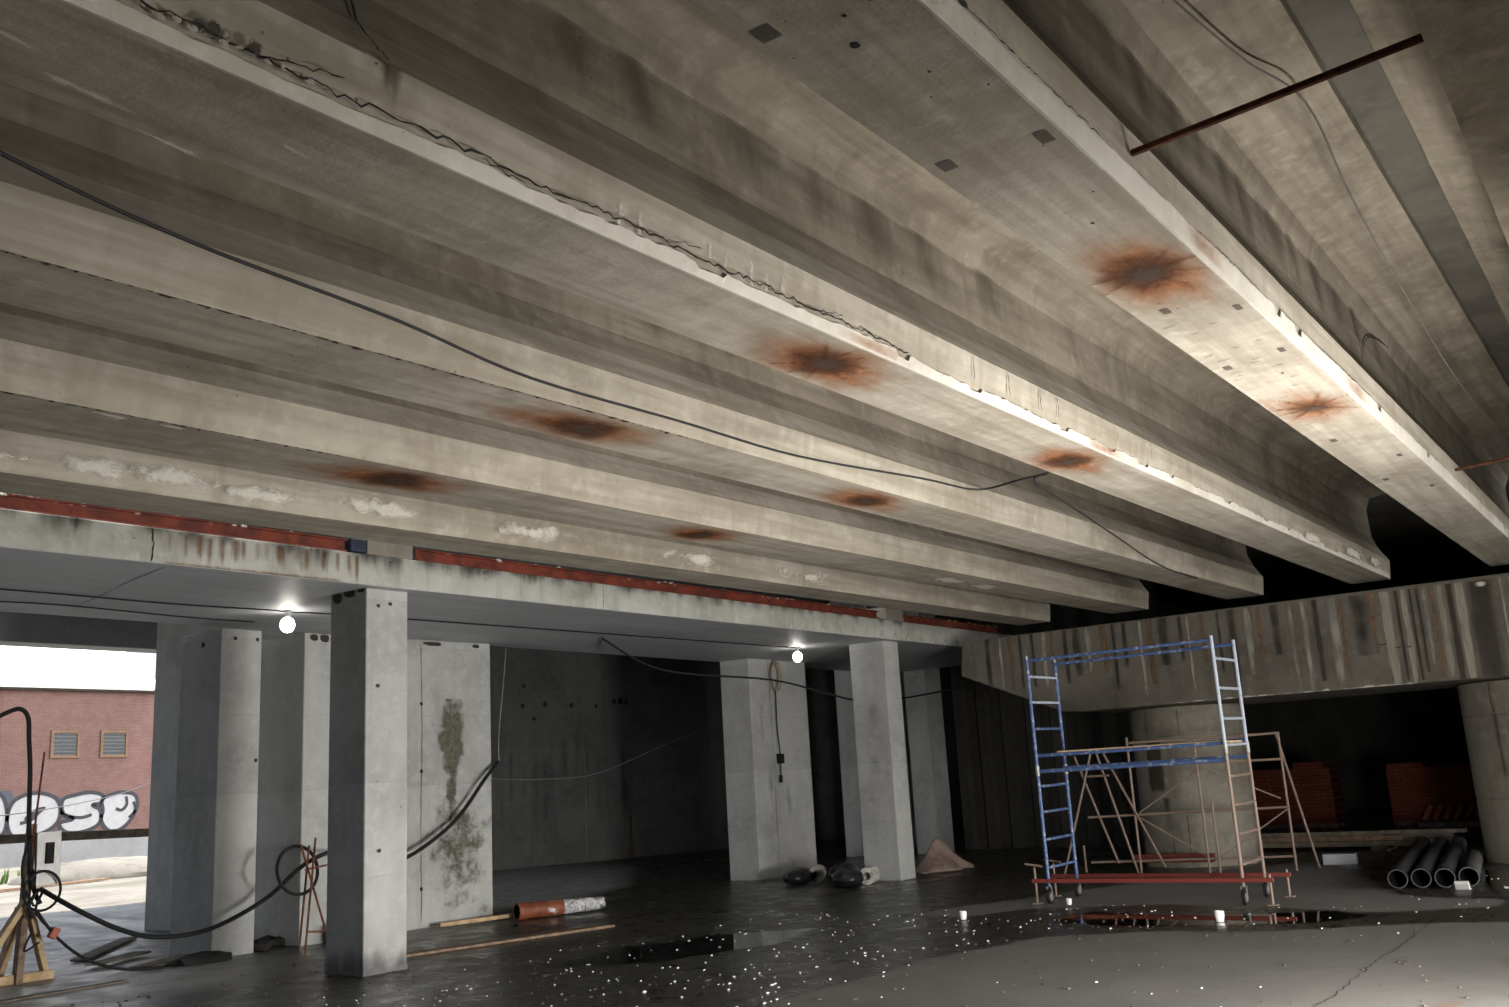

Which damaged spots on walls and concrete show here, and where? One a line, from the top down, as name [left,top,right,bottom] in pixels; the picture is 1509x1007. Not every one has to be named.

crack [140,0,909,354]
rust [1101,248,1195,298]
rust [772,345,871,384]
rust [517,413,629,439]
peeling [67,456,196,484]
rust [339,470,448,490]
rust [1041,451,1093,470]
peeling [228,487,289,503]
peeling [351,499,411,517]
peeling [499,523,557,540]
damp [432,699,483,883]
crack [1281,919,1435,1007]